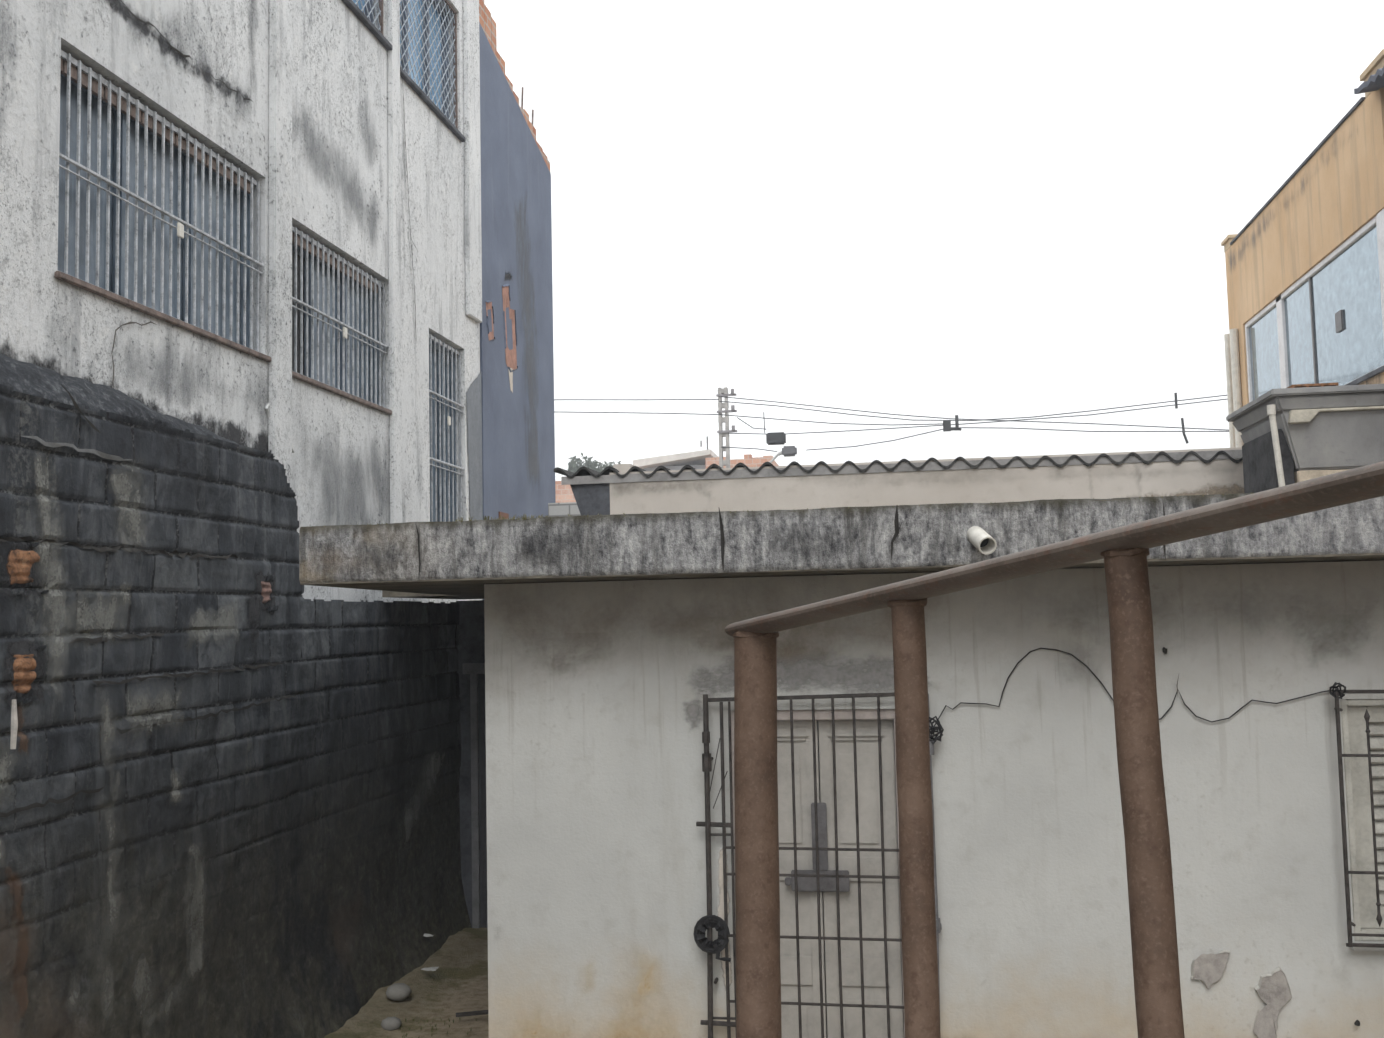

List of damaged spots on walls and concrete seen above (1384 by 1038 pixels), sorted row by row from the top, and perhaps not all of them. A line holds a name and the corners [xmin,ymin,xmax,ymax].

crack [120,0,253,102]
spalling [0,537,49,599]
spalling [2,639,47,708]
peeling [1191,950,1230,989]
peeling [1253,967,1292,1038]